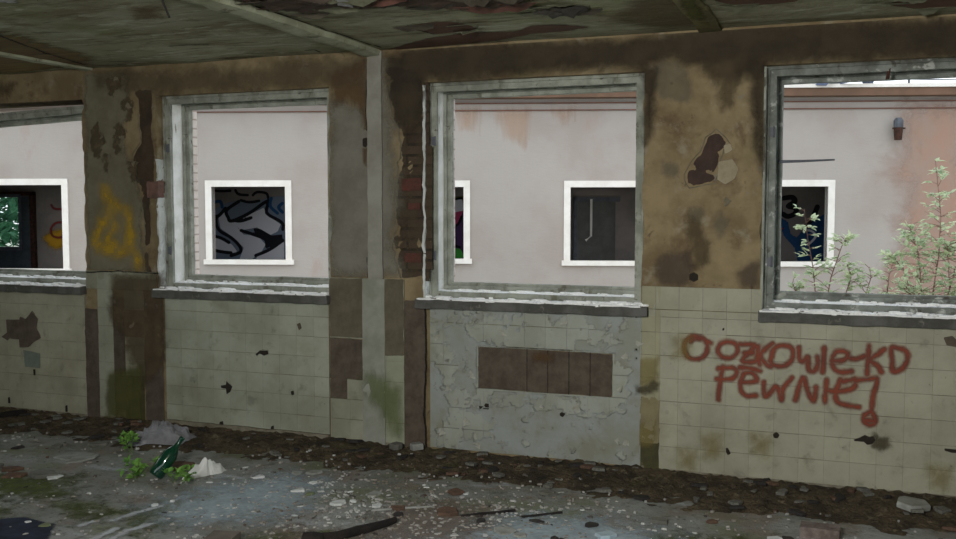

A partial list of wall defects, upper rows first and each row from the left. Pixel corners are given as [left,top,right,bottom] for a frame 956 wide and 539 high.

peeling [240,0,587,49]
peeling [713,0,799,12]
spalling [90,77,164,272]
spalling [684,129,739,189]
peeling [384,68,660,478]
water stain [659,218,708,284]
water stain [740,264,759,285]
spalling [2,311,41,375]
peeling [85,308,100,417]